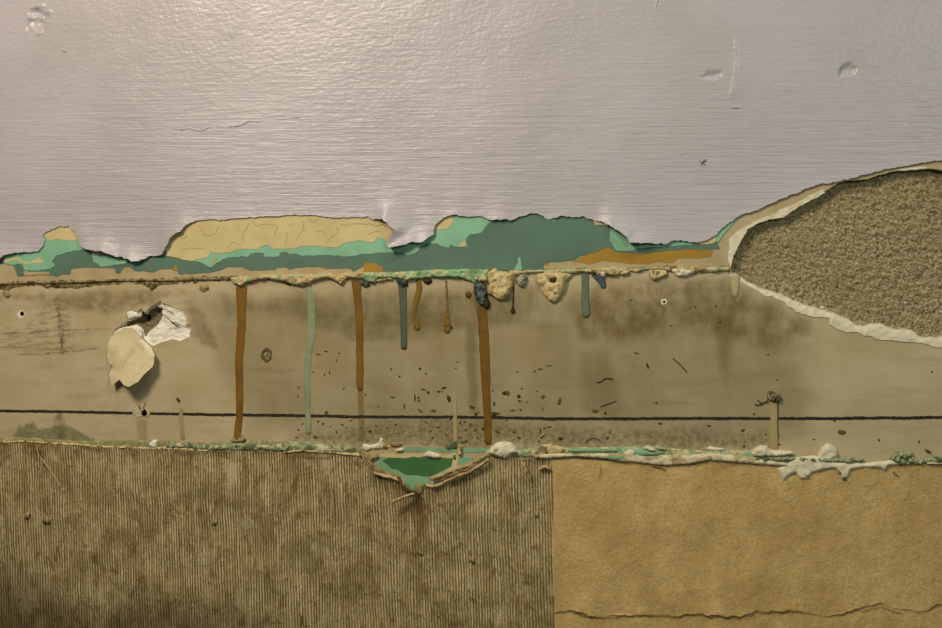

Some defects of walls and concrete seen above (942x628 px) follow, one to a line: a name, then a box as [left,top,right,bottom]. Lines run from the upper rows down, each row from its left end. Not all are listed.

flaking render [107,301,191,387]
flaking render [0,167,942,347]